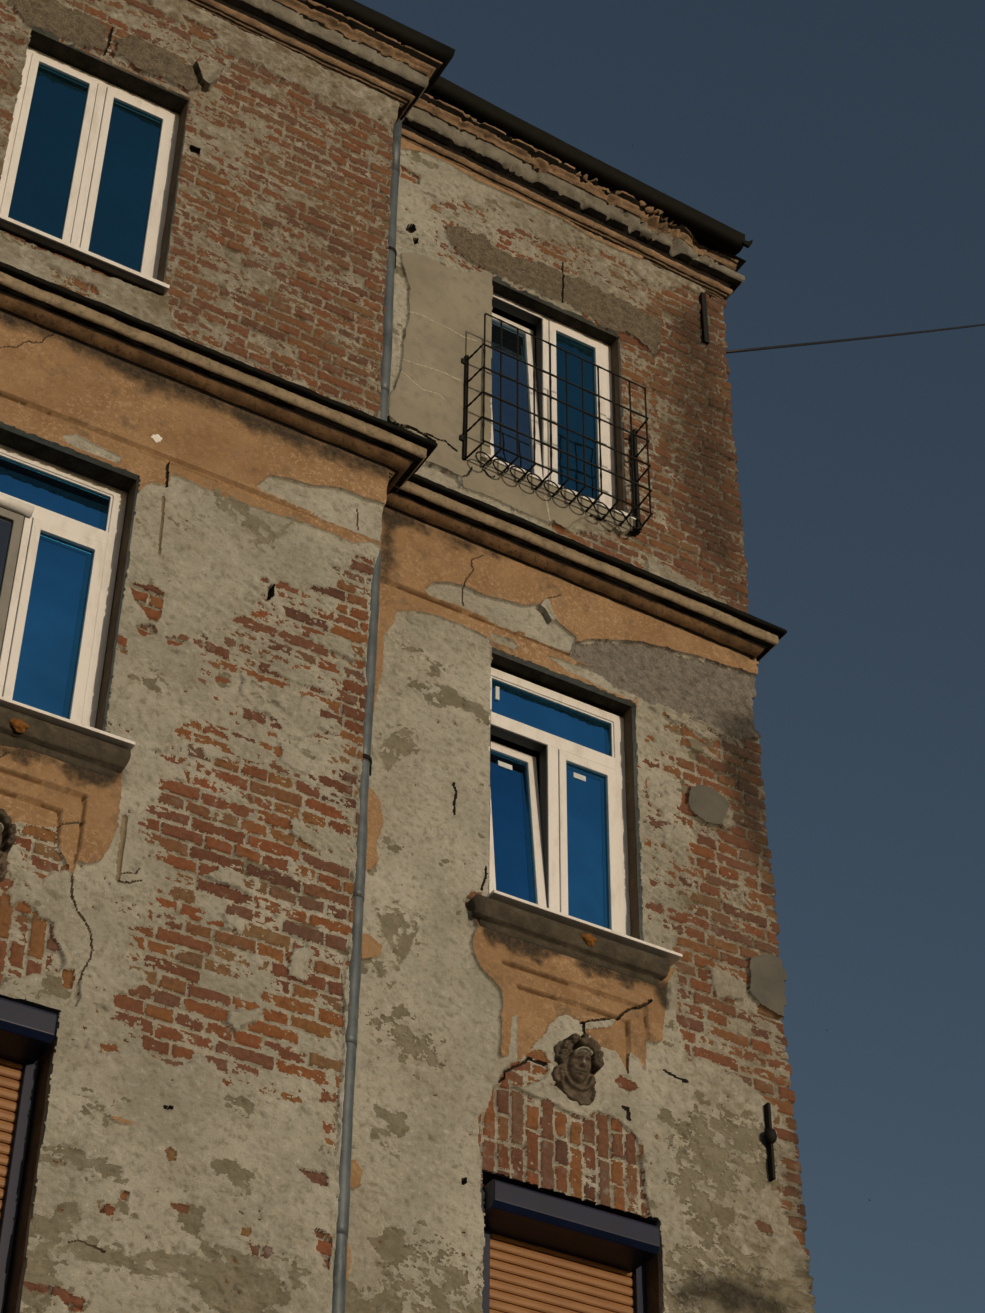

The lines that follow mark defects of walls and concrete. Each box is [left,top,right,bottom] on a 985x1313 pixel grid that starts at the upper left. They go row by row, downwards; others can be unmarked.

spalling [0,0,420,418]
spalling [429,197,749,613]
peeling [62,433,122,464]
peeling [208,474,385,548]
peeling [419,462,461,489]
spalling [0,553,447,1155]
crack [70,874,94,983]
spalling [425,581,815,1313]
crack [579,999,653,1034]
spalling [165,1148,177,1161]
spalling [299,1168,328,1187]